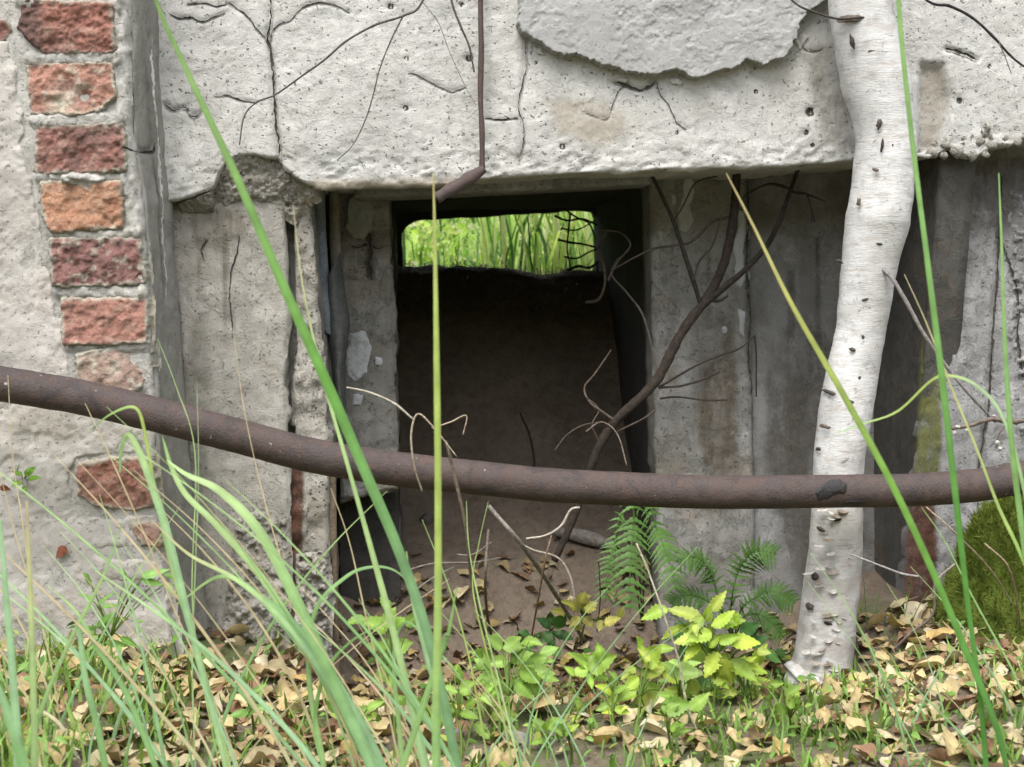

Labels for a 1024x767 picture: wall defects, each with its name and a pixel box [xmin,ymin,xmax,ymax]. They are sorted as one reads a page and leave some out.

peeling [515,0,826,86]
crack [491,40,527,164]
crack [589,82,686,129]
crack [122,0,350,298]
spalling [176,150,322,225]
crack [229,241,239,337]
peeling [345,331,383,381]
leakage [770,336,832,475]
leakage [780,508,811,573]